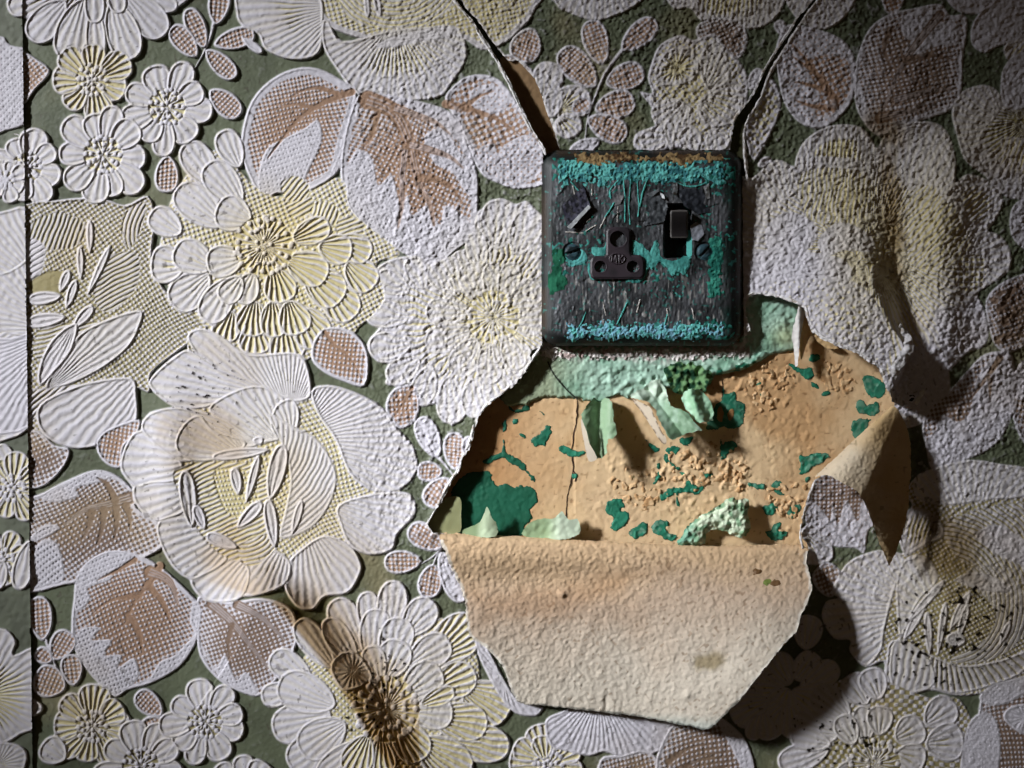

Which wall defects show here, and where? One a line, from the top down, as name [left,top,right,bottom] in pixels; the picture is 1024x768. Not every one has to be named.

peeling [428,496,498,538]
peeling [499,294,858,541]